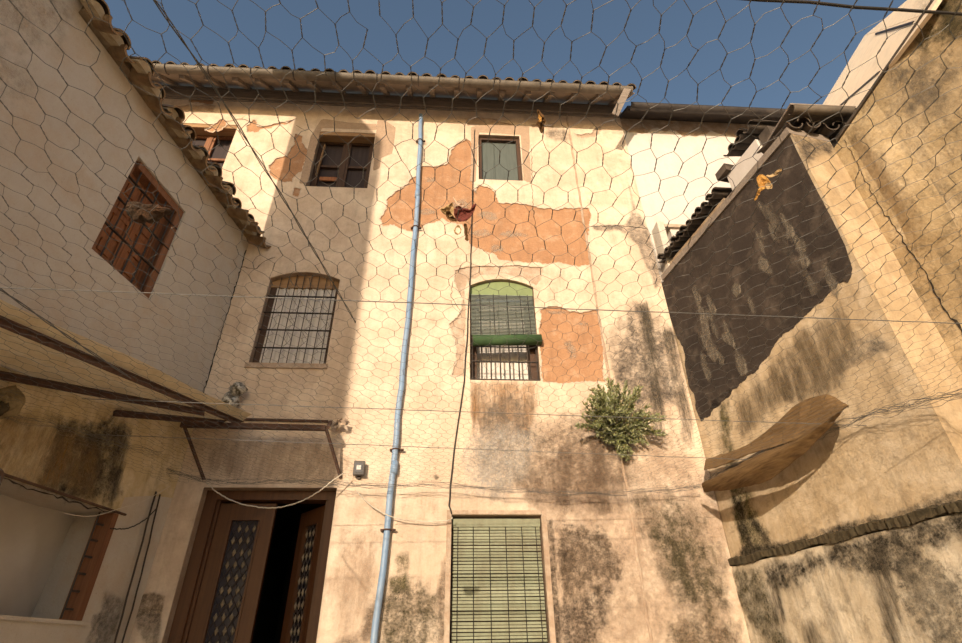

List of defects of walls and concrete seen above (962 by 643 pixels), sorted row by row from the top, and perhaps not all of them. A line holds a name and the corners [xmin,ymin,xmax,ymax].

water stain [920,0,962,49]
peeling [246,118,395,198]
peeling [379,116,592,377]
crack [845,141,962,332]
peeling [538,305,606,385]
water stain [616,303,691,436]
water stain [0,417,130,501]
water stain [549,522,621,643]
water stain [732,491,962,643]